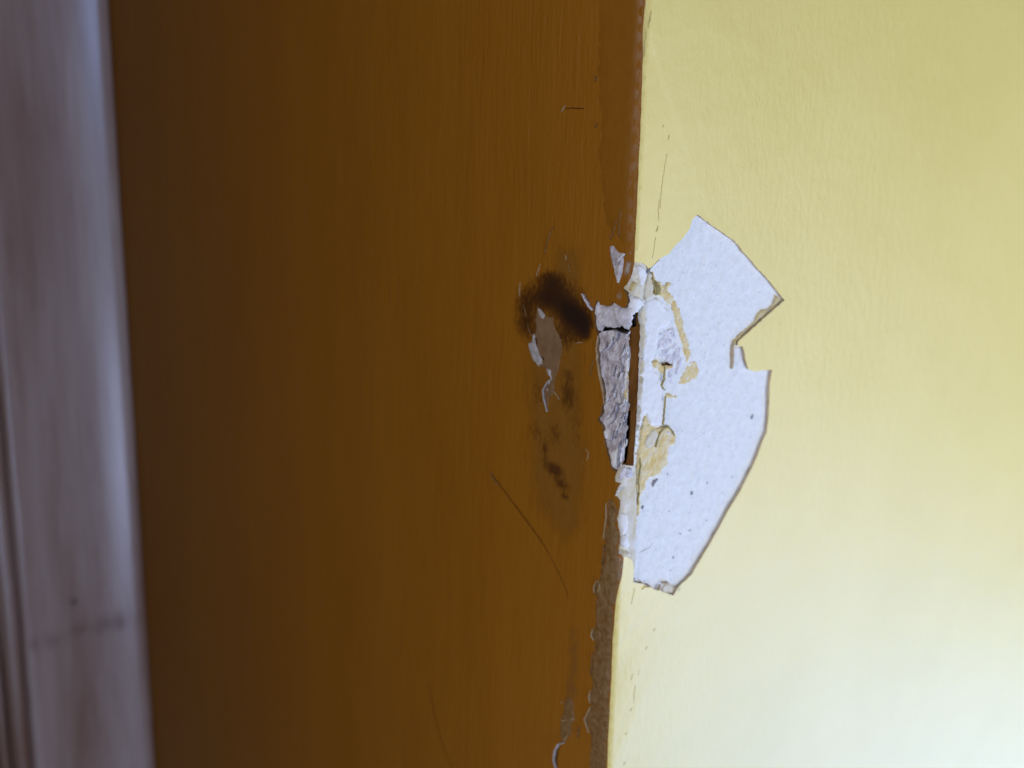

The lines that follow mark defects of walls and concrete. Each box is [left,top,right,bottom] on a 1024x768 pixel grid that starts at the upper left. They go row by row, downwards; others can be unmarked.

peeling [528,306,563,412]
leakage [516,272,593,342]
peeling [552,216,782,768]